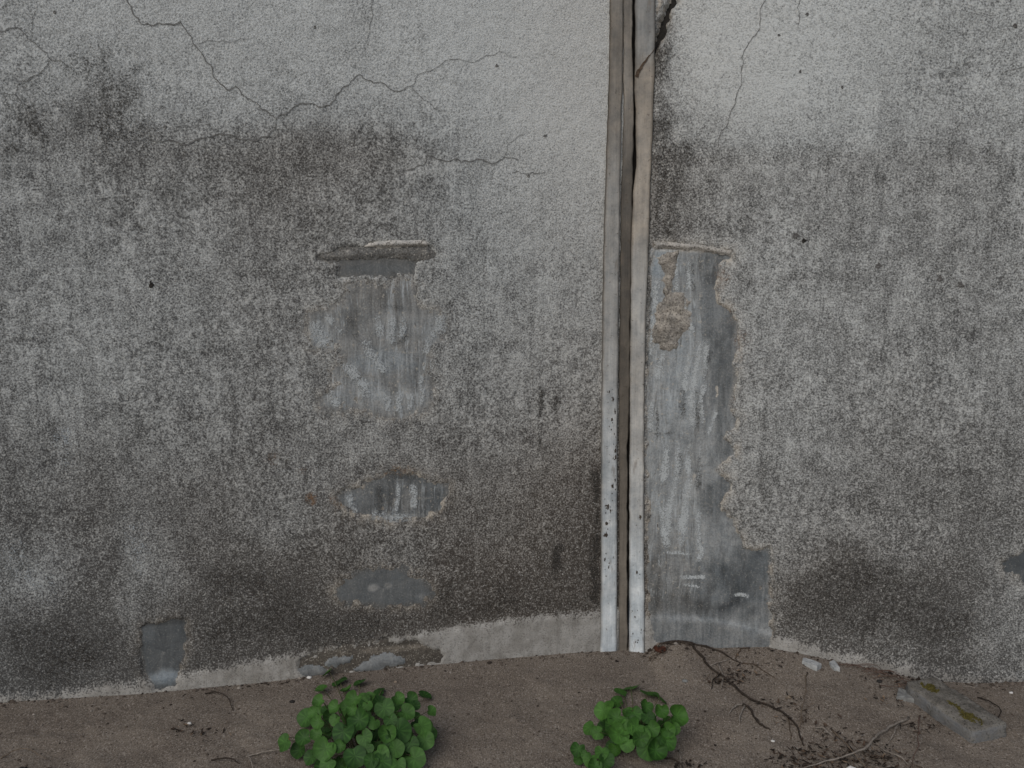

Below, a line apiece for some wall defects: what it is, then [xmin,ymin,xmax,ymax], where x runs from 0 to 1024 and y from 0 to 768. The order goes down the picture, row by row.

crack [0,5,71,125]
crack [126,0,517,145]
crack [635,0,677,78]
crack [396,135,544,174]
spalling [302,240,446,423]
spalling [649,250,692,351]
spalling [335,470,450,522]